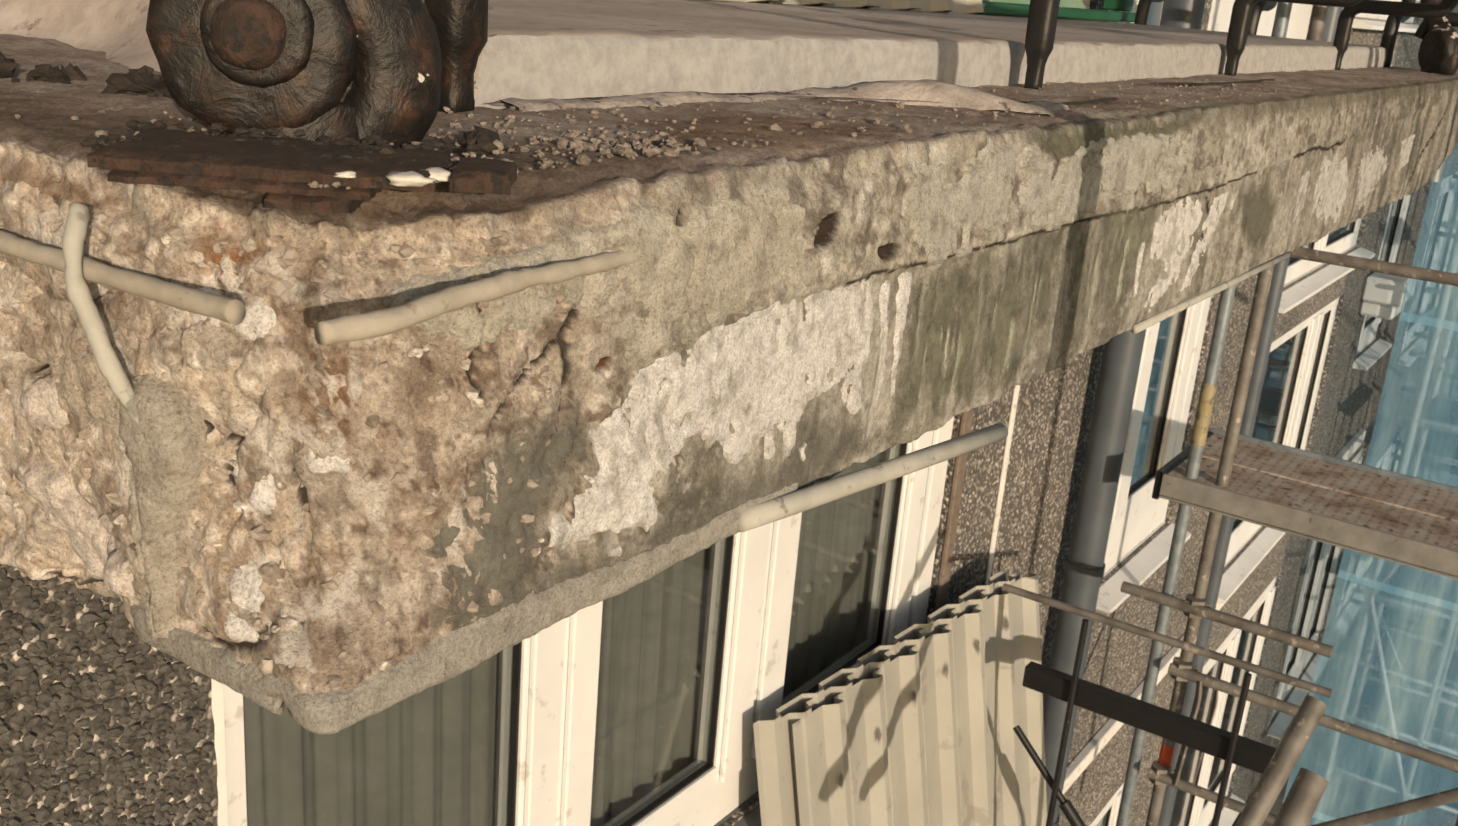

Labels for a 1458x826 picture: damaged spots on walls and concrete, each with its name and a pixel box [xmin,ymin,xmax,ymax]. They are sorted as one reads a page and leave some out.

water stain [1116,239,1129,298]
water stain [1243,189,1274,245]
crack [1407,102,1450,185]
spalling [0,166,639,692]
water stain [432,425,583,628]
peeling [498,271,912,570]
water stain [608,331,885,566]